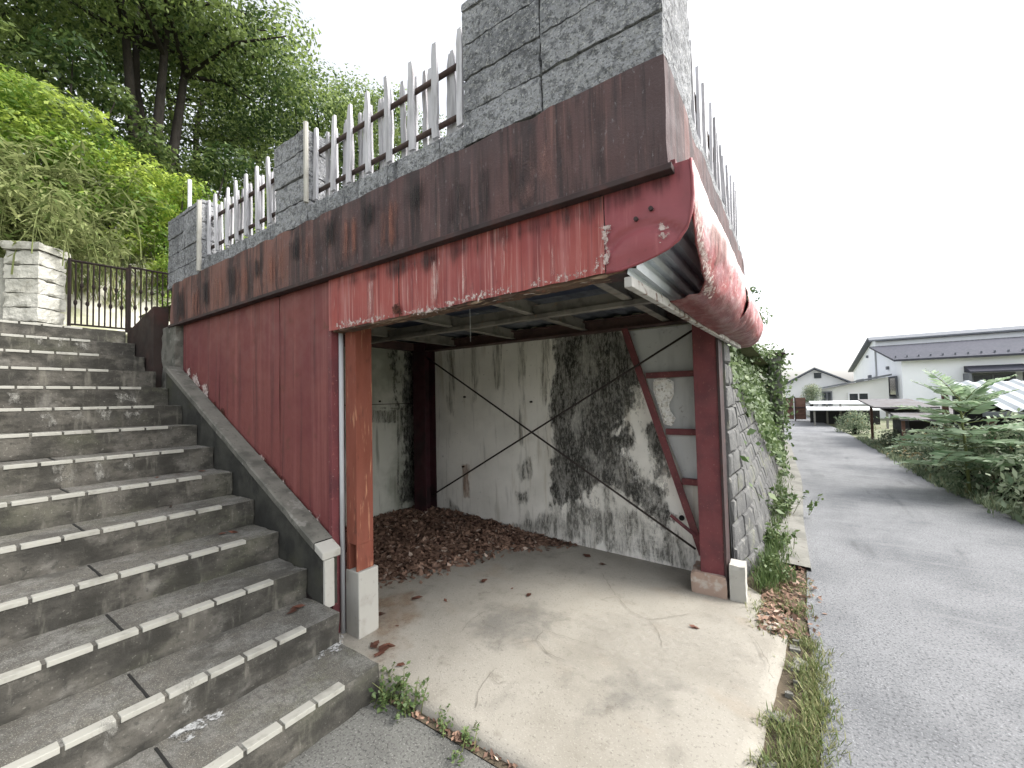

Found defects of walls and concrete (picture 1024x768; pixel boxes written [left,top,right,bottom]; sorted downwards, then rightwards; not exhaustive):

peeling [531,225,611,286]
peeling [405,285,512,315]
damp [388,350,414,507]
damp [514,331,686,568]
spalling [629,378,676,426]